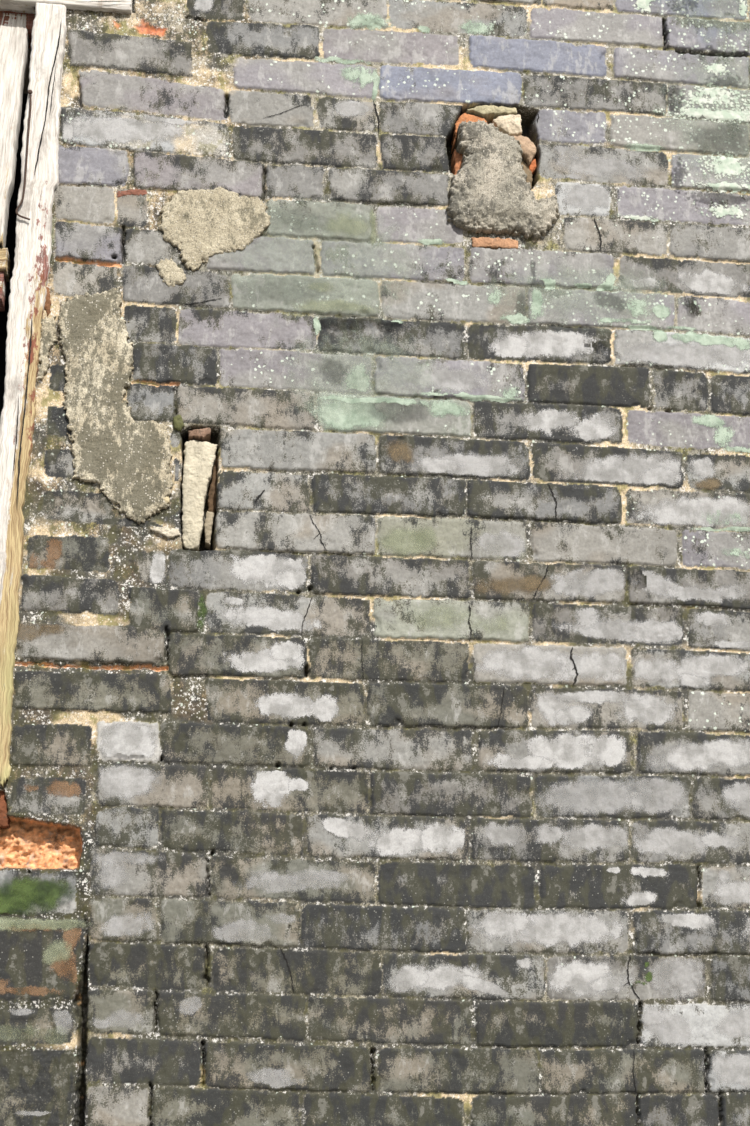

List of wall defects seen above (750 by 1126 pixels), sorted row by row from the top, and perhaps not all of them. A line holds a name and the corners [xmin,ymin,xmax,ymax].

spalling [451,105,536,190]
peeling [36,286,218,551]
crack [570,647,578,684]
crack [624,955,640,1000]